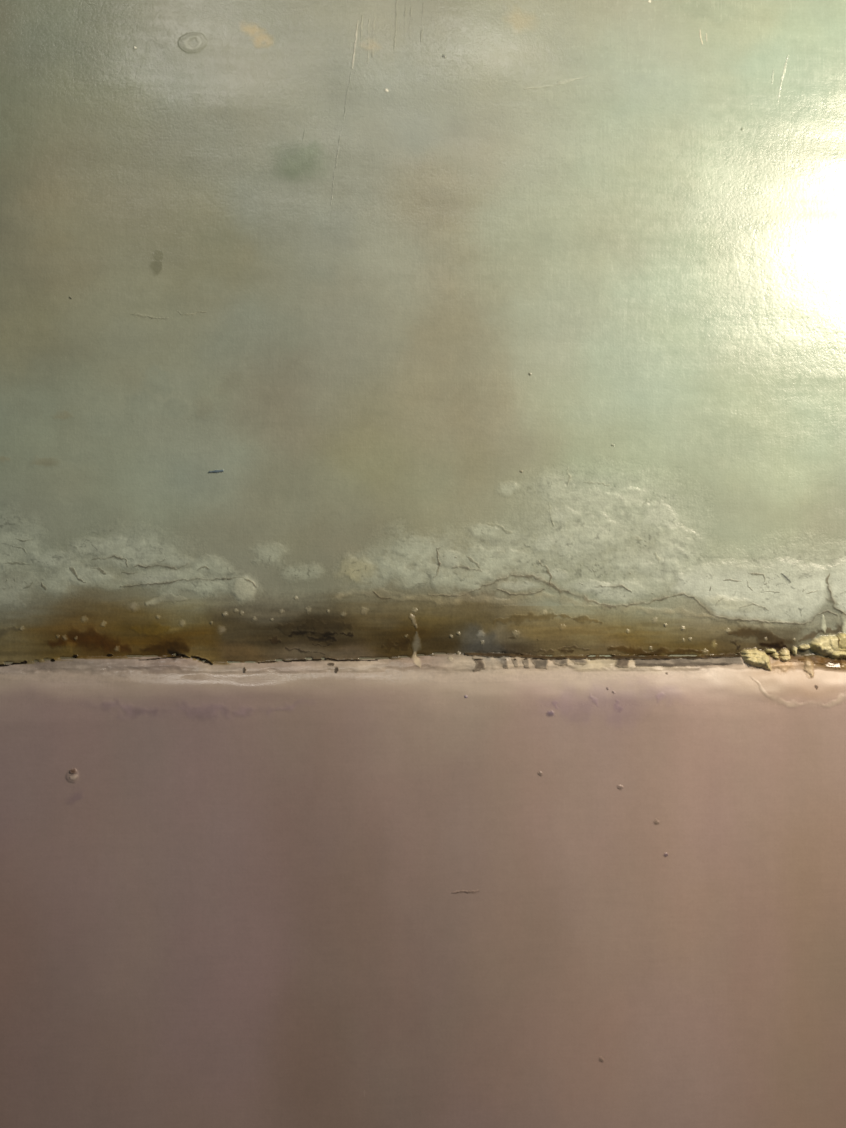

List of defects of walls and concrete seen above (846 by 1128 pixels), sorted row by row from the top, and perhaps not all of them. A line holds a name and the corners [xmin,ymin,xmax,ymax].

crack [0,538,47,590]
crack [69,552,257,588]
leakage [199,588,521,668]
crack [426,547,846,653]